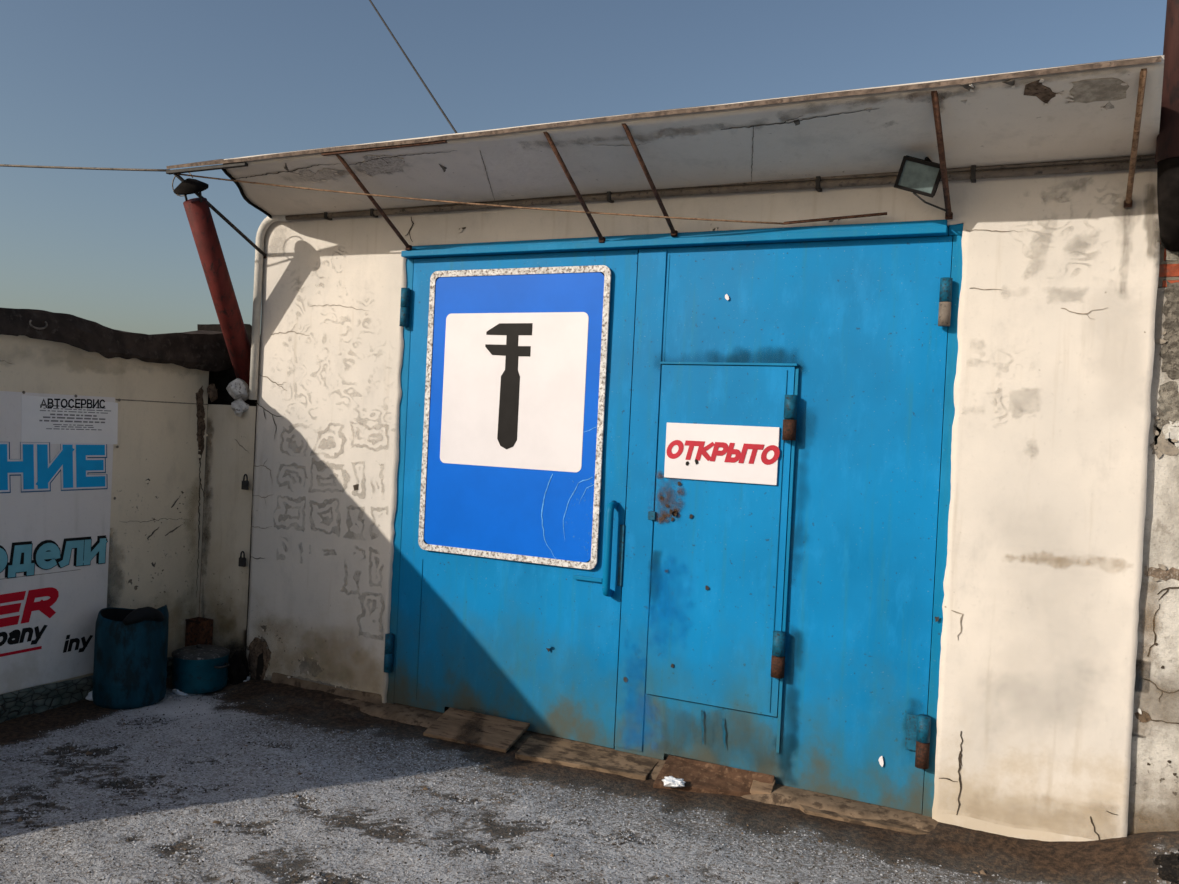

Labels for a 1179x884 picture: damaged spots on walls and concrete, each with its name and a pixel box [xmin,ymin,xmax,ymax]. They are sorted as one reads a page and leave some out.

peeling [1002,78,1129,111]
spalling [1150,280,1179,459]
crack [235,374,287,529]
rust [657,473,684,523]
crack [1139,587,1179,724]
crack [939,731,963,815]